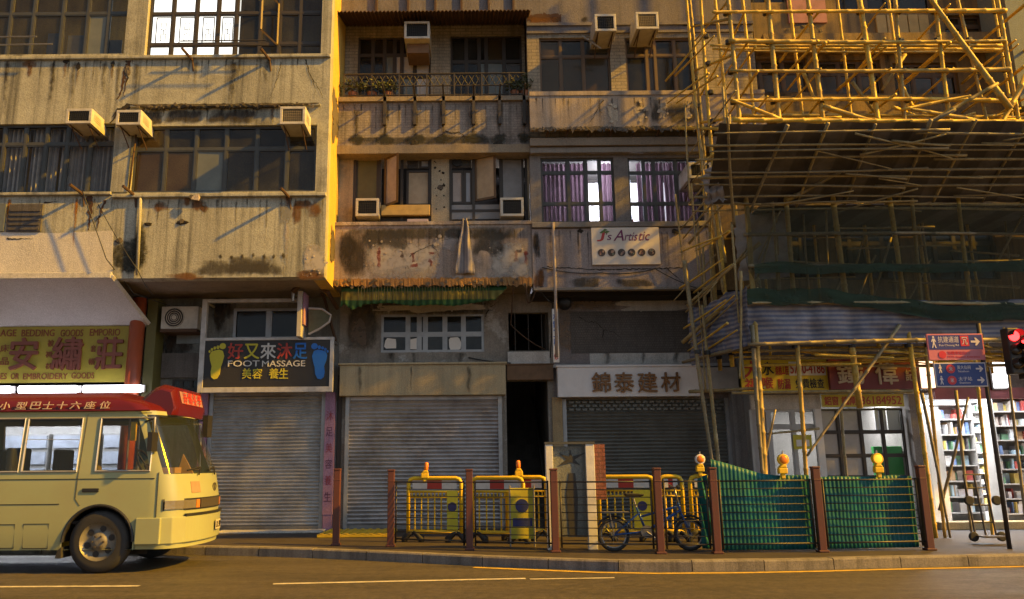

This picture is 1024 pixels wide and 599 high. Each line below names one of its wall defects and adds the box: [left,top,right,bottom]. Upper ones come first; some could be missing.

rust [185,198,207,212]
rust [286,197,310,222]
damp [113,201,162,273]
damp [200,257,281,275]